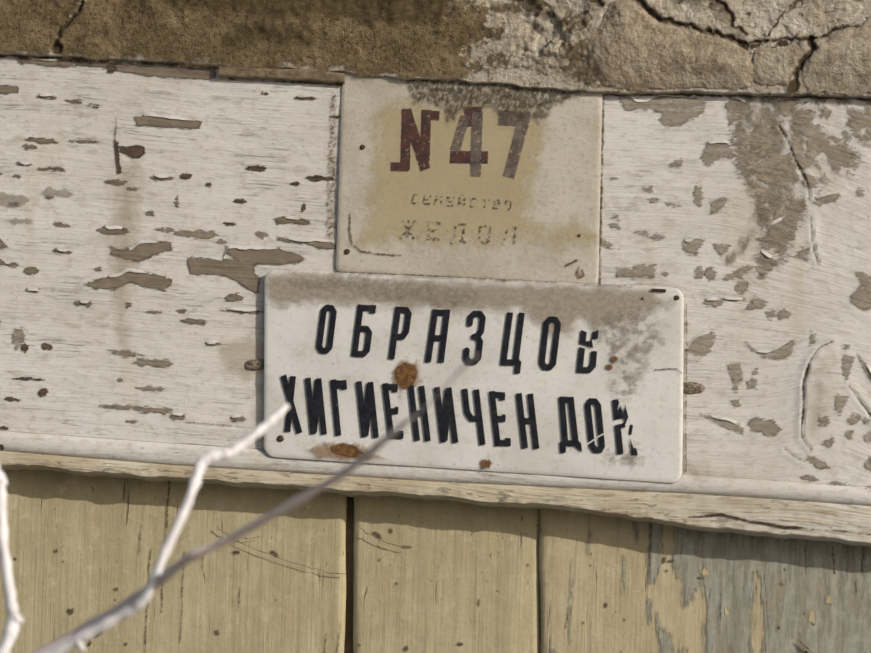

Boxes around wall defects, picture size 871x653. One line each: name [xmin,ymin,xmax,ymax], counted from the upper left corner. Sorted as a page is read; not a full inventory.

crack [0,0,219,69]
crack [605,0,871,101]
peeling [133,113,203,130]
peeling [618,95,707,127]
spalling [104,126,145,191]
peeling [681,95,871,321]
peeling [84,227,336,314]
corrosion [312,443,378,459]
corrosion [393,361,421,389]
peeling [700,414,783,437]
crack [799,341,833,460]
peeling [632,521,871,653]